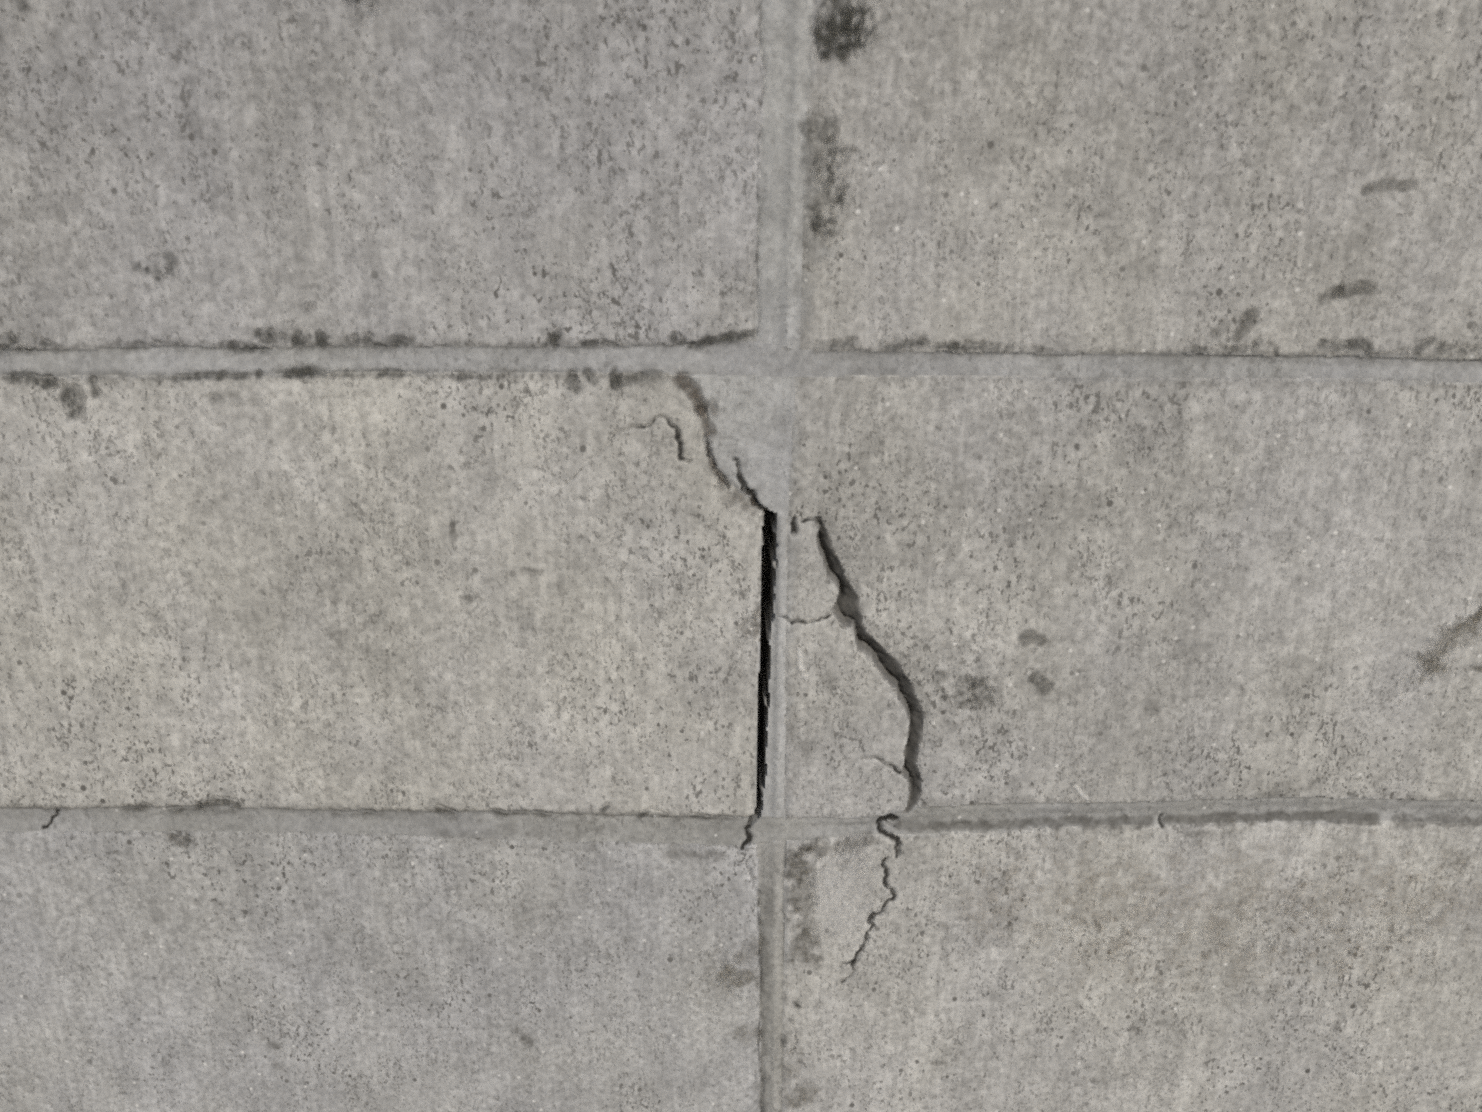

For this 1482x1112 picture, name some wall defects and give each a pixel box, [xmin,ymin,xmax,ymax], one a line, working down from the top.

water stain [815,0,866,61]
crack [636,417,926,983]